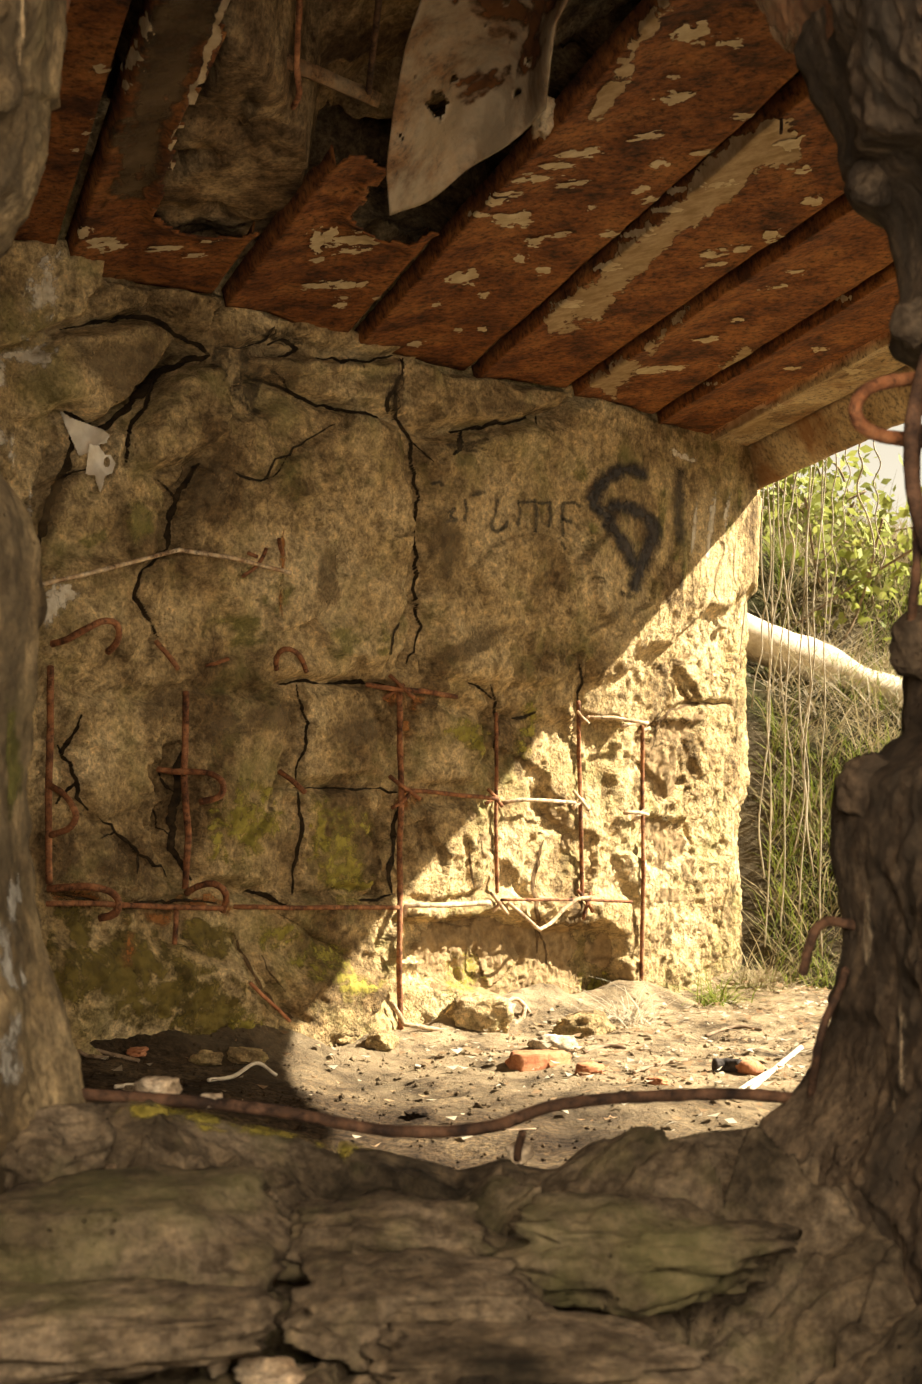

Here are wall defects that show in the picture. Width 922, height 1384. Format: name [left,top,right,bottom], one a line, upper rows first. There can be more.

corrosion [452,0,556,104]
peeling [588,0,744,122]
peeling [300,279,381,309]
peeling [306,226,379,263]
peeling [468,146,604,276]
peeling [543,113,812,338]
peeling [589,305,691,400]
crack [37,315,537,953]
crack [576,664,584,701]
crack [648,686,730,761]
crack [531,840,547,968]
crack [234,935,293,1018]